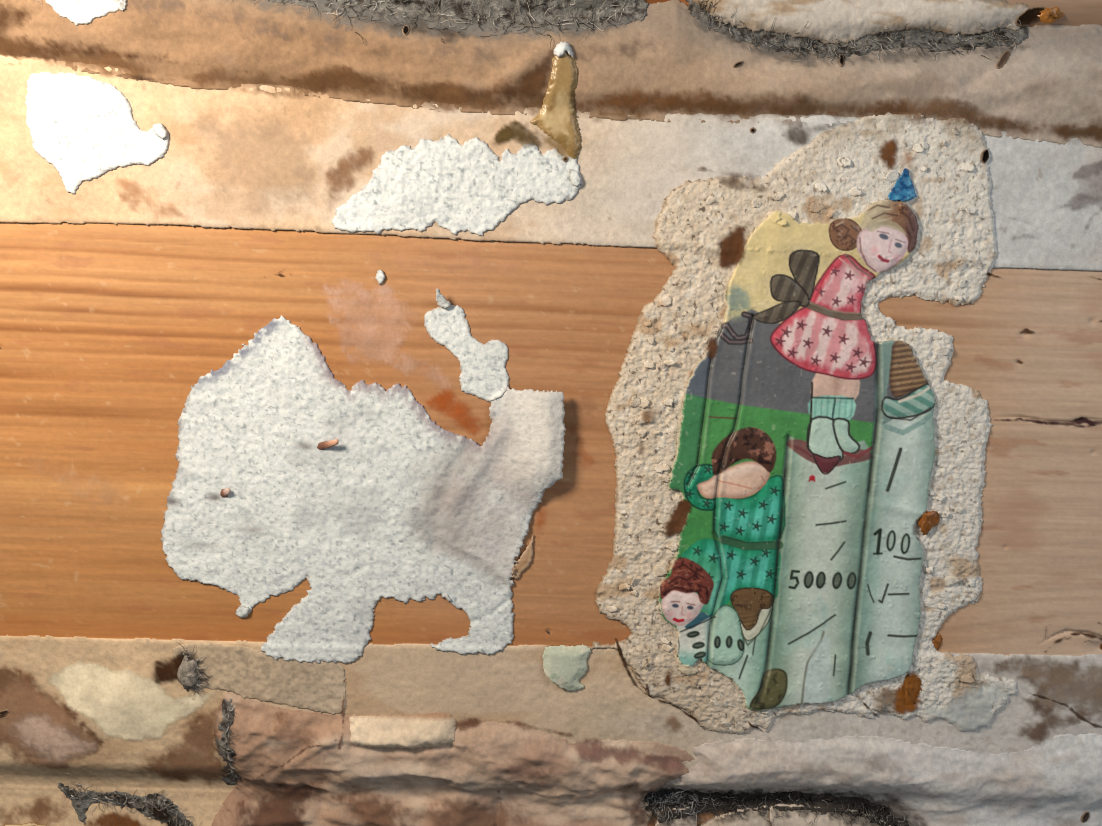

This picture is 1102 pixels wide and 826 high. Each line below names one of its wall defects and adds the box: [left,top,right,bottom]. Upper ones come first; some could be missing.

water stain [0,11,24,26]
water stain [28,43,135,59]
water stain [310,67,376,91]
water stain [412,58,550,100]
water stain [597,91,739,112]
water stain [884,100,1013,127]
water stain [1054,125,1102,139]
peeling [160,288,566,664]
rust [878,673,922,714]
water stain [0,670,97,769]